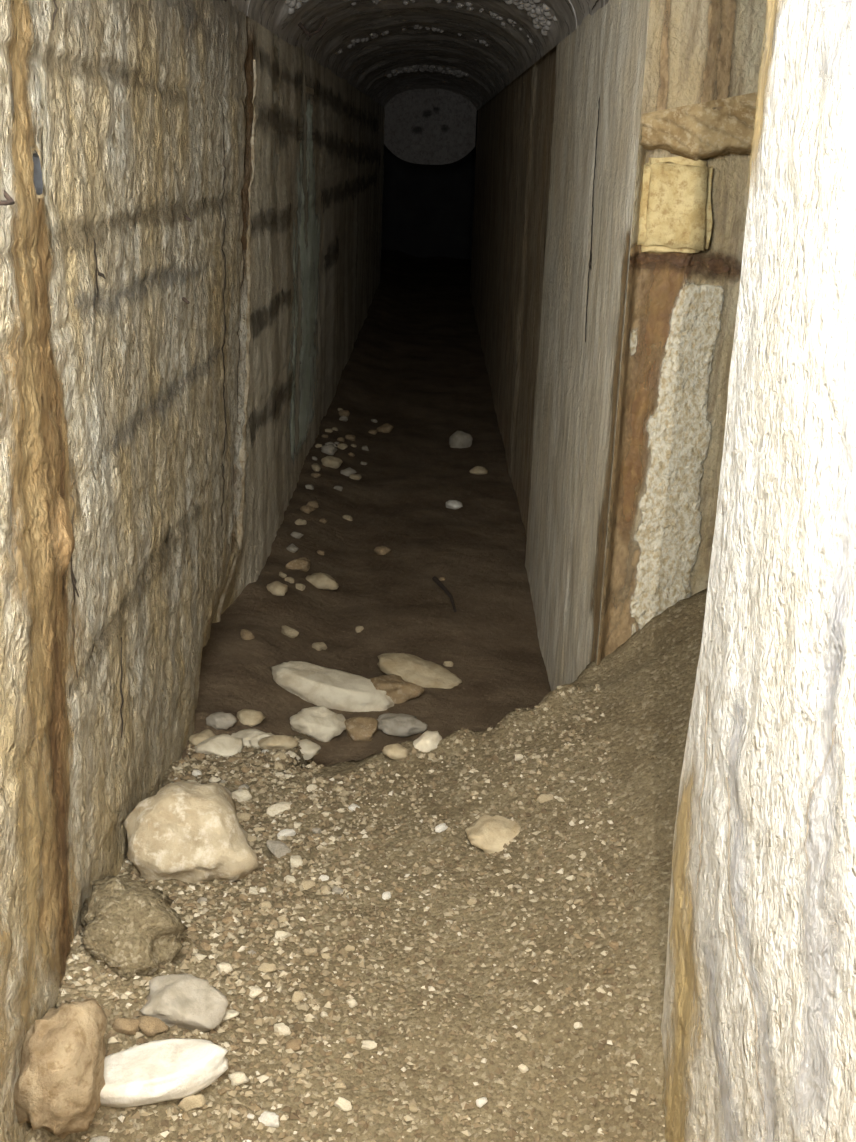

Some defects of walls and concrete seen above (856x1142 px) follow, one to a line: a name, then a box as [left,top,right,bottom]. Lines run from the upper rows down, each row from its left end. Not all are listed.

peeling [629,92,758,635]